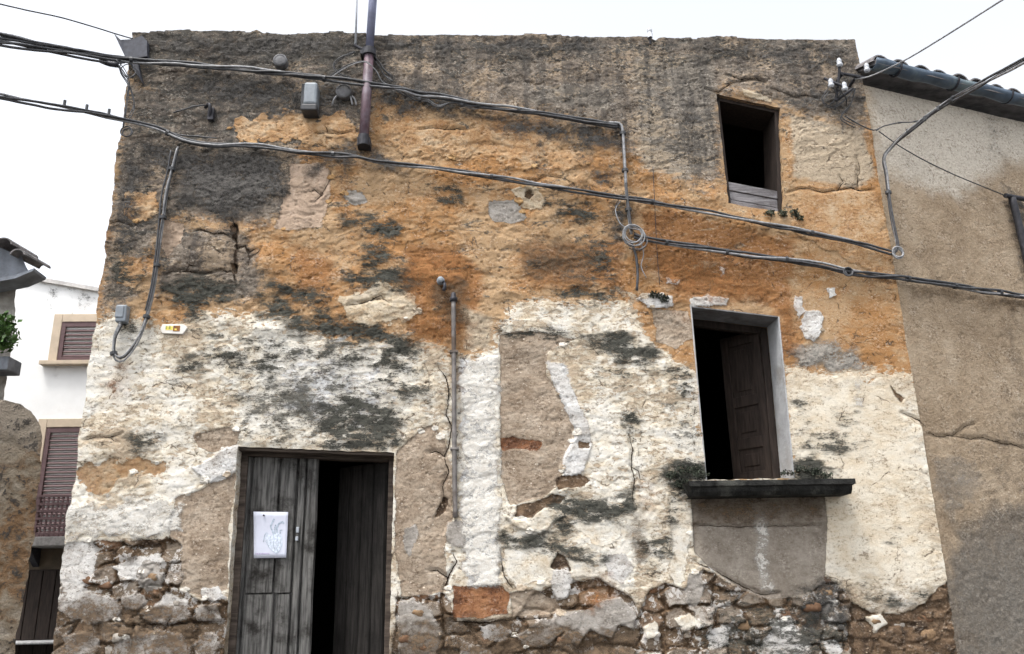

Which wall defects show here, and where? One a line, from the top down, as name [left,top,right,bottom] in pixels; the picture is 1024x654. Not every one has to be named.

crack [165,220,262,283]
damp [142,31,622,184]
damp [694,43,866,115]
crack [789,157,870,193]
spalling [51,426,240,654]
damp [158,270,445,451]
crack [431,367,458,502]
damp [496,325,708,524]
peeling [392,331,957,654]
crack [903,413,1021,448]